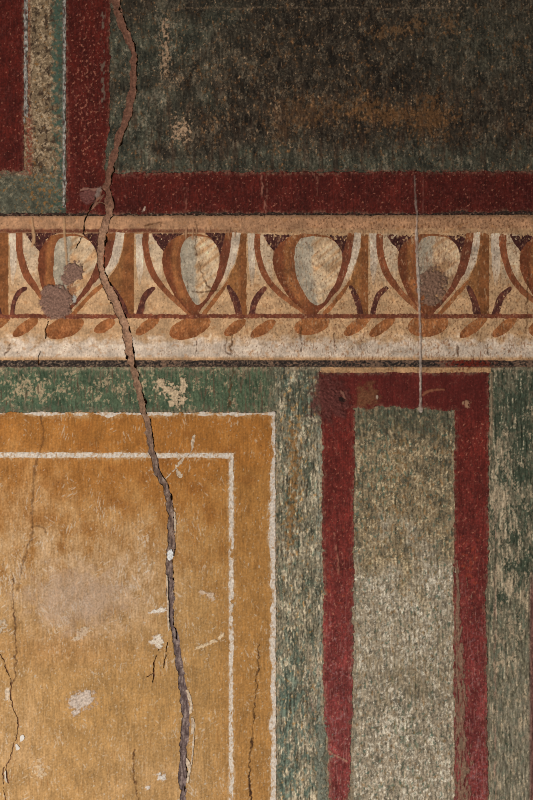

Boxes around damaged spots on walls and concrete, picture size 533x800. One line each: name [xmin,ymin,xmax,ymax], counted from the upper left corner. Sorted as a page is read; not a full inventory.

crack [77,0,196,800]
peeling [153,377,188,411]
spalling [148,634,164,649]
crack [0,613,25,800]
spalling [66,690,98,717]